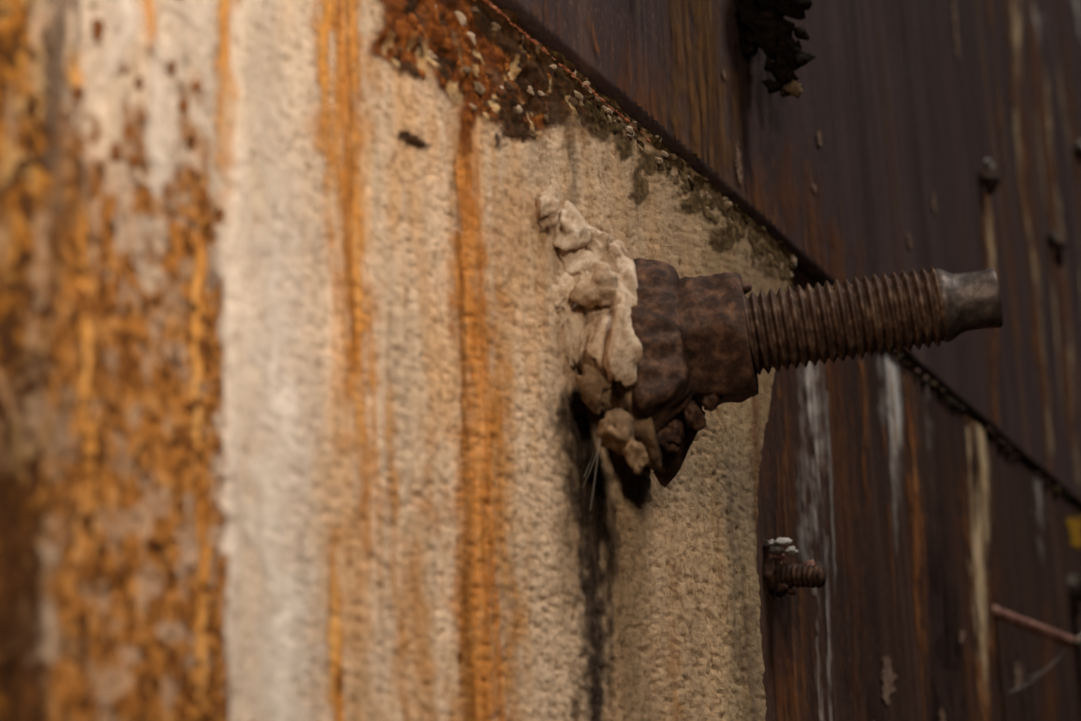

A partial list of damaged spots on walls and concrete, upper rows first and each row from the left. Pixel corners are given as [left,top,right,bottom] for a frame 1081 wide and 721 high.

corrosion [0,0,231,721]
corrosion [328,543,345,721]
corrosion [315,0,397,536]
corrosion [449,127,517,721]
spalling [370,0,797,290]
water stain [558,386,615,721]
corrosion [652,0,734,177]
water stain [804,361,832,490]
water stain [818,595,832,721]
water stain [884,352,925,650]
corrosion [963,412,994,721]
corrosion [984,194,997,275]